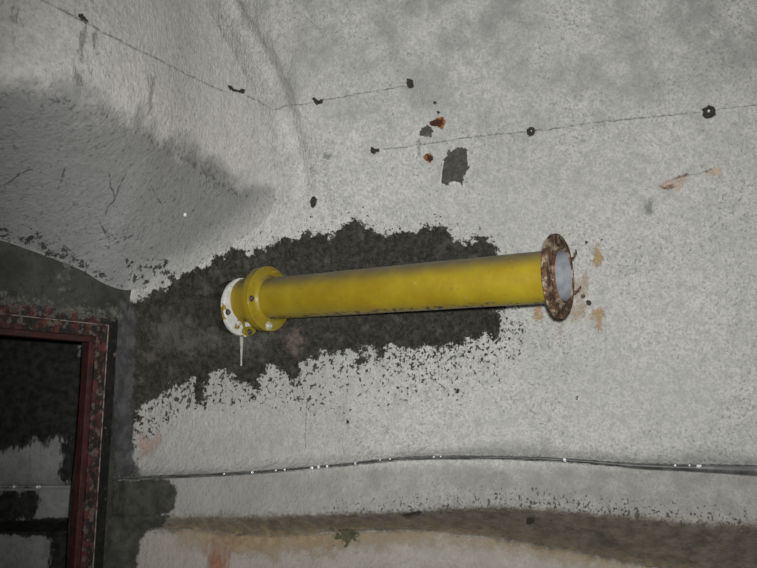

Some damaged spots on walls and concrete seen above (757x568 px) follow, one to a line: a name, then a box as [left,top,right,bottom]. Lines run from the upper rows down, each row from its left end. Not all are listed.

rust [430,117,446,129]
peeling [439,147,471,186]
peeling [660,167,721,192]
leakage [0,204,757,568]